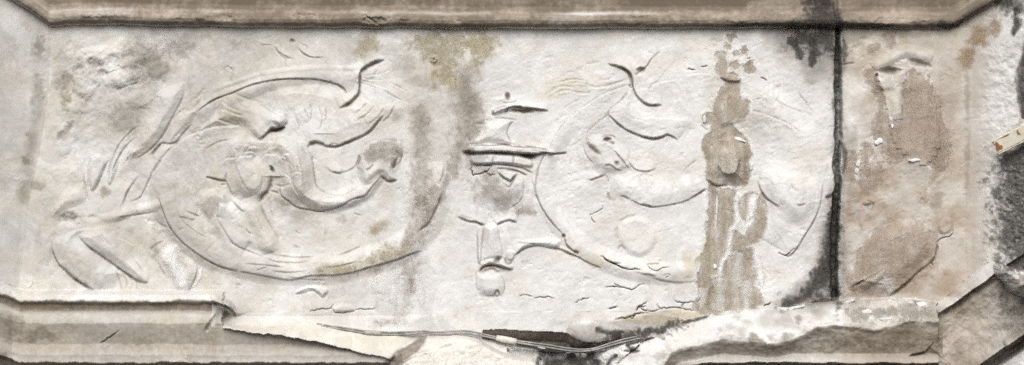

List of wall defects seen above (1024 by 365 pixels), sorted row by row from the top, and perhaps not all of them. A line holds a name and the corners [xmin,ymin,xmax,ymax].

damp [937,20,963,29]
damp [997,0,1023,36]
damp [718,192,757,310]
damp [731,0,895,309]
spalling [845,225,935,322]
spalling [843,68,949,193]
damp [982,143,1024,275]